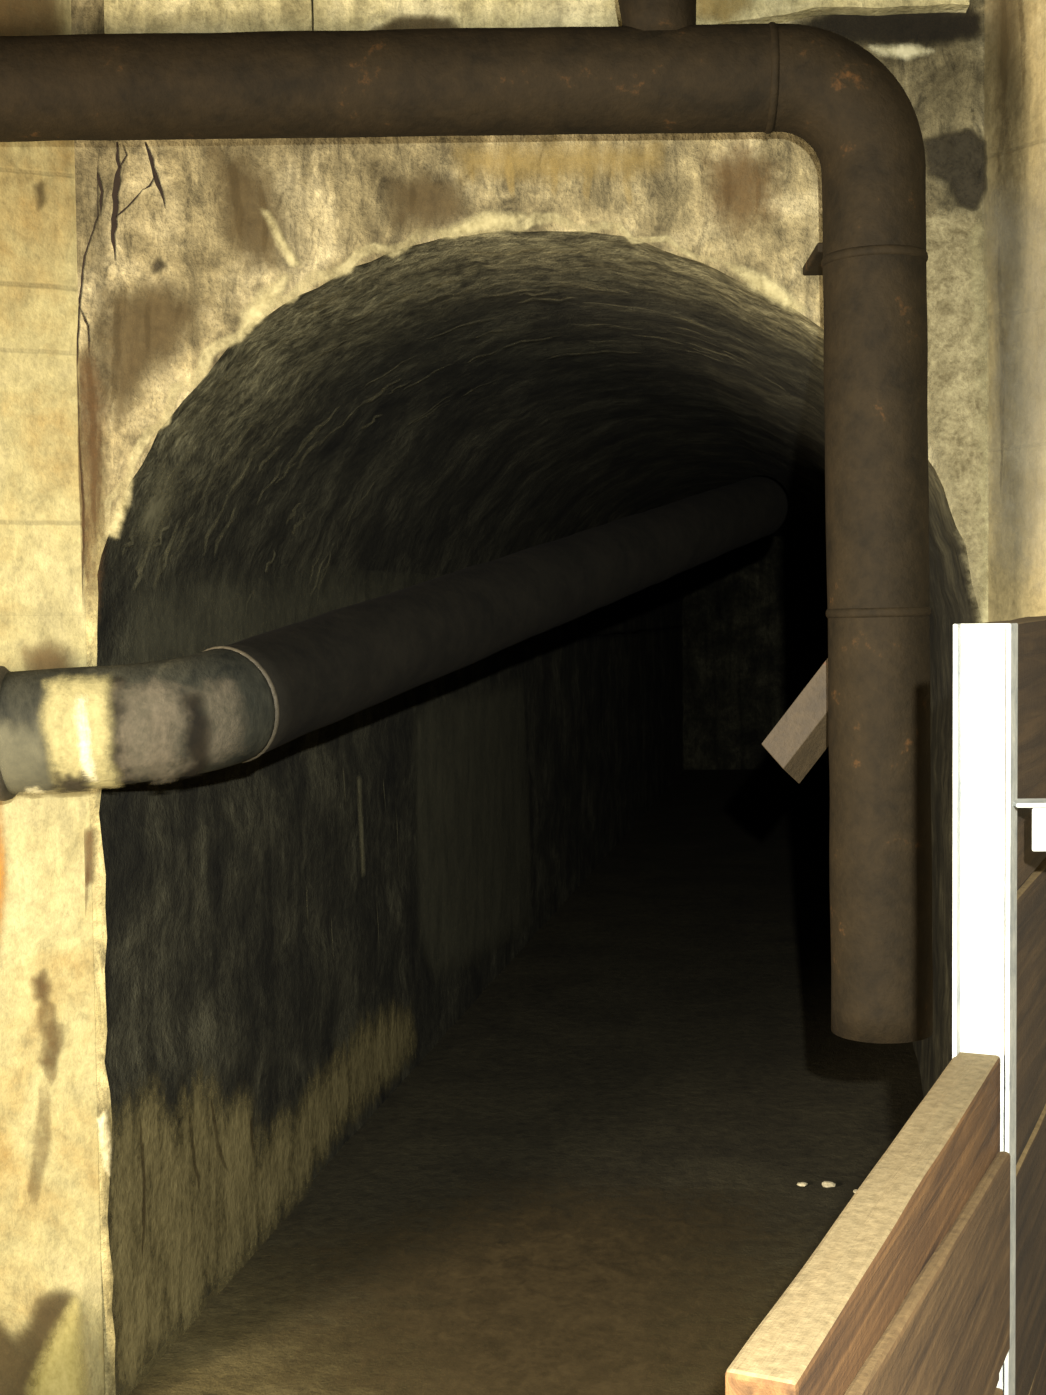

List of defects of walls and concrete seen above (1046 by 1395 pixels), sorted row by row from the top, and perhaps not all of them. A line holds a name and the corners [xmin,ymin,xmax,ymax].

damp [375,17,457,30]
crack [77,142,165,589]